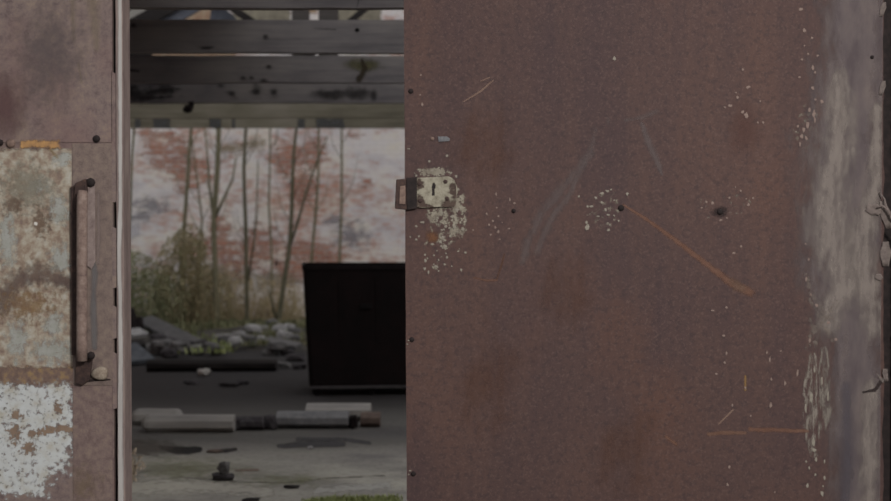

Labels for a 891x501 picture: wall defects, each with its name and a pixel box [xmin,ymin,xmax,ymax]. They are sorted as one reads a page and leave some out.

corrosion [33,205,52,233]
peeling [410,154,474,274]
corrosion [0,265,71,321]
corrosion [0,365,73,386]
peeling [0,381,73,499]
peeling [796,273,840,496]